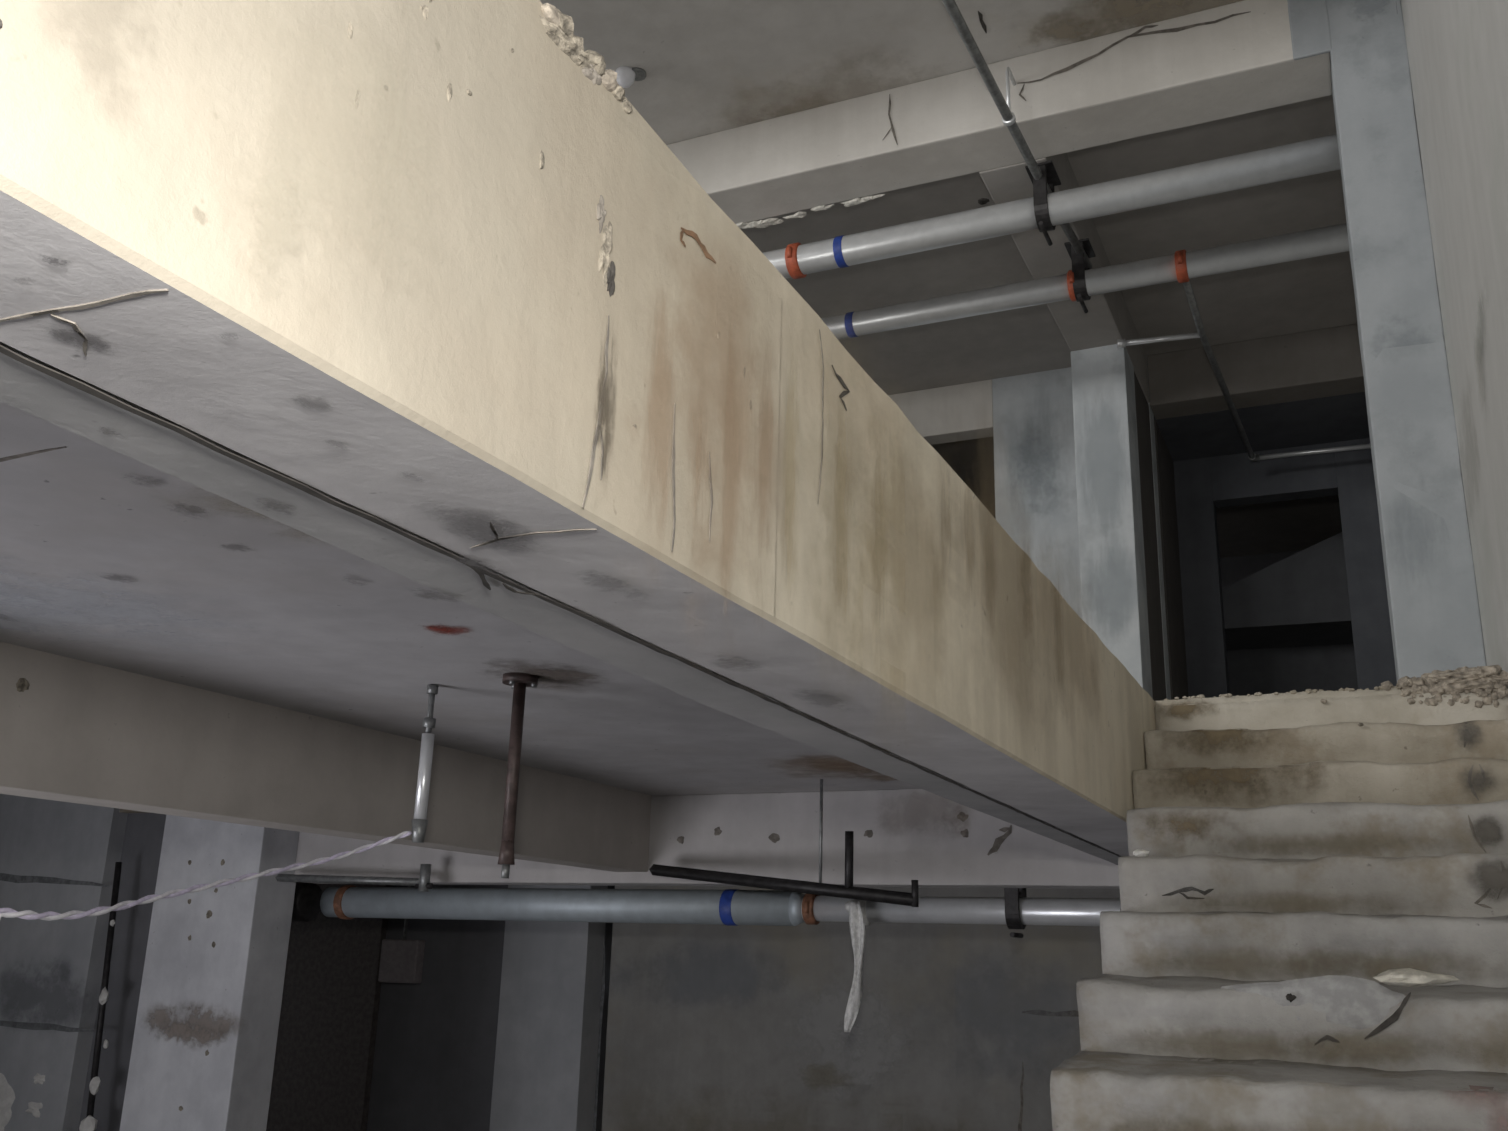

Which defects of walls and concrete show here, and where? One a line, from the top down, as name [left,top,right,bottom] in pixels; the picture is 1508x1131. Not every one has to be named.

spalling [539,3,633,114]
crack [1017,11,1251,101]
crack [680,227,716,264]
crack [0,289,1121,857]
rust [517,665,587,688]
crack [1162,887,1214,899]
leakage [149,1007,234,1044]